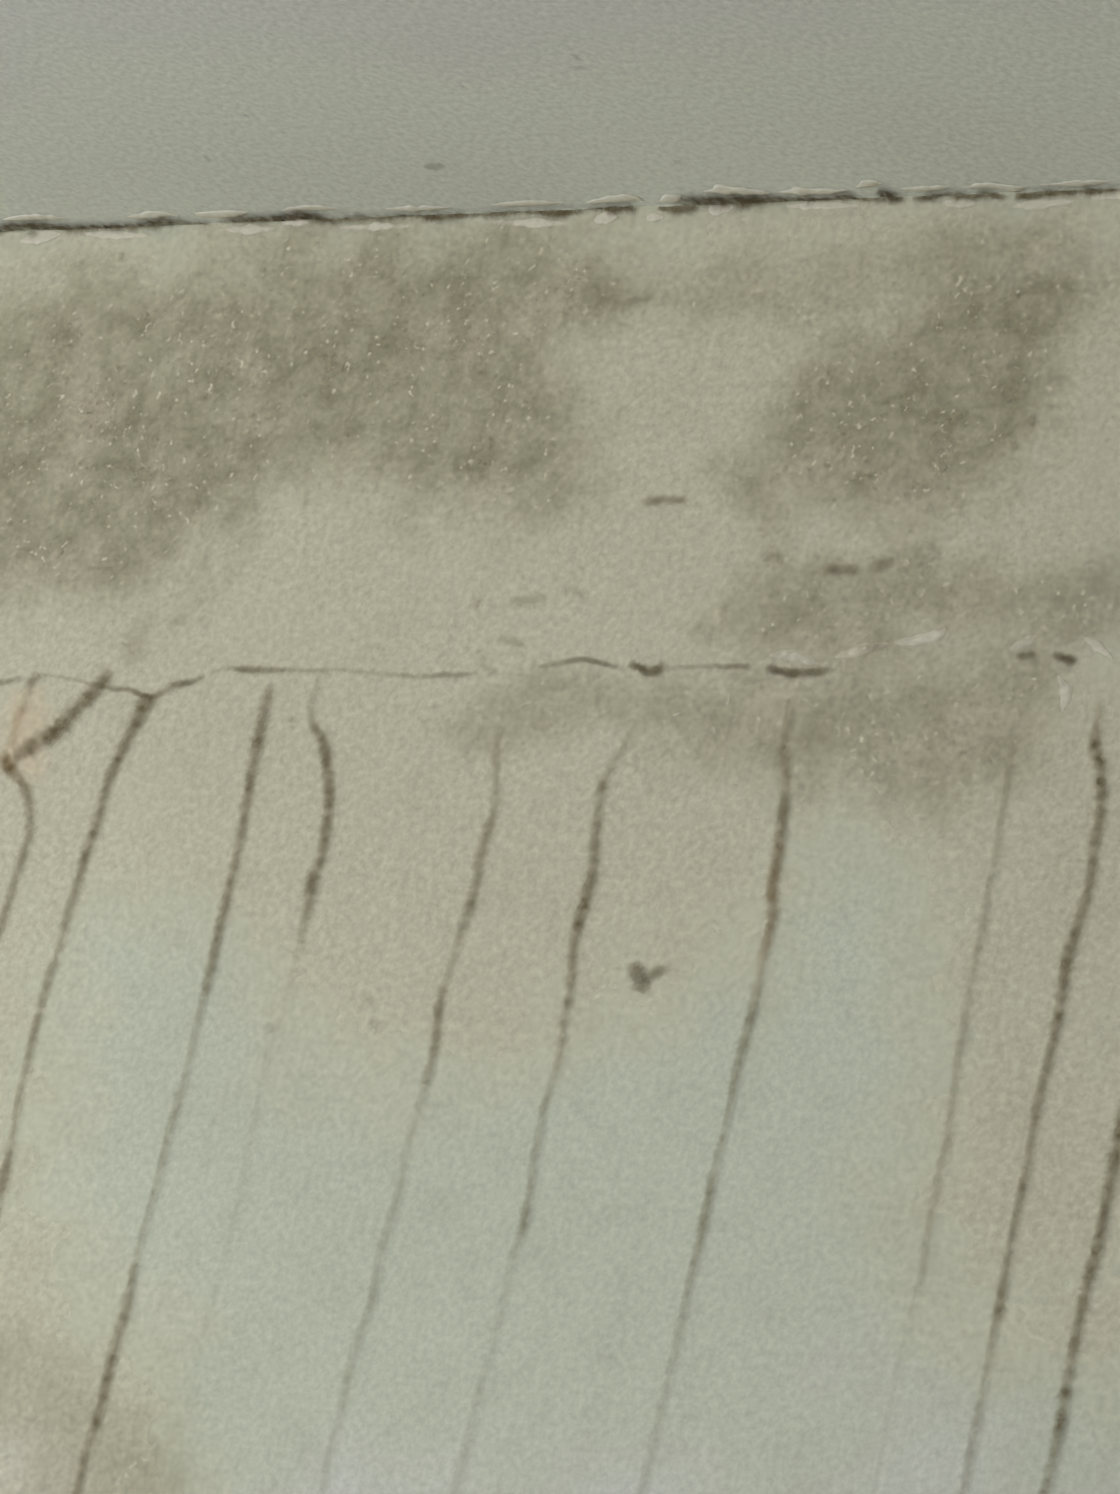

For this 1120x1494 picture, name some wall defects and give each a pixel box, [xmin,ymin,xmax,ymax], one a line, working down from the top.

crack [0,179,1120,244]
water stain [393,271,723,629]
water stain [719,234,1120,492]
water stain [0,248,436,942]
crack [598,662,661,675]
water stain [457,476,852,838]
crack [763,627,947,676]
crack [1010,635,1113,713]
water stain [766,799,786,935]
water stain [963,716,1120,1040]
water stain [973,1067,1091,1234]
corrosion [1054,1118,1120,1436]